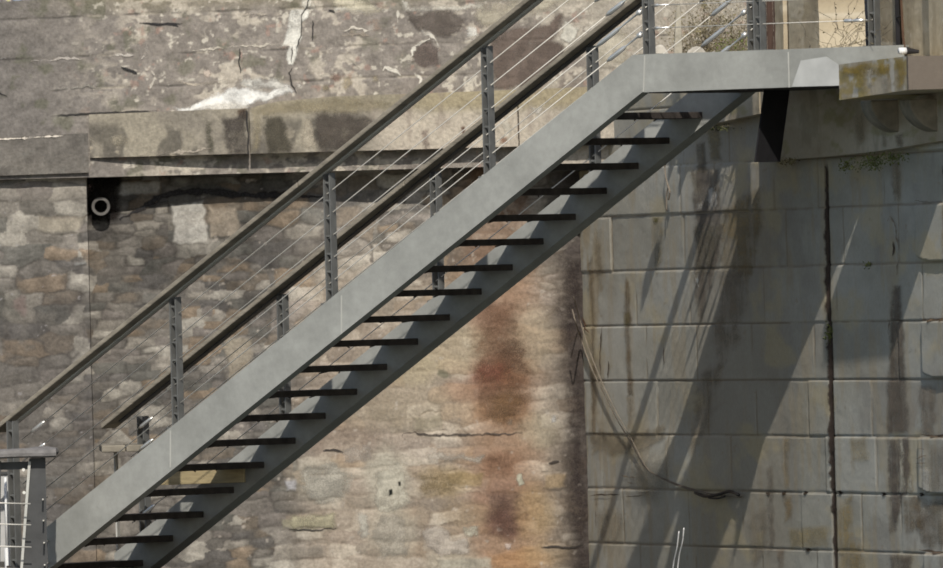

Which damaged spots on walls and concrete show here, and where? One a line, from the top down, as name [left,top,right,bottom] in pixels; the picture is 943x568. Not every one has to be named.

leakage [693,131,759,339]
leakage [887,287,943,547]